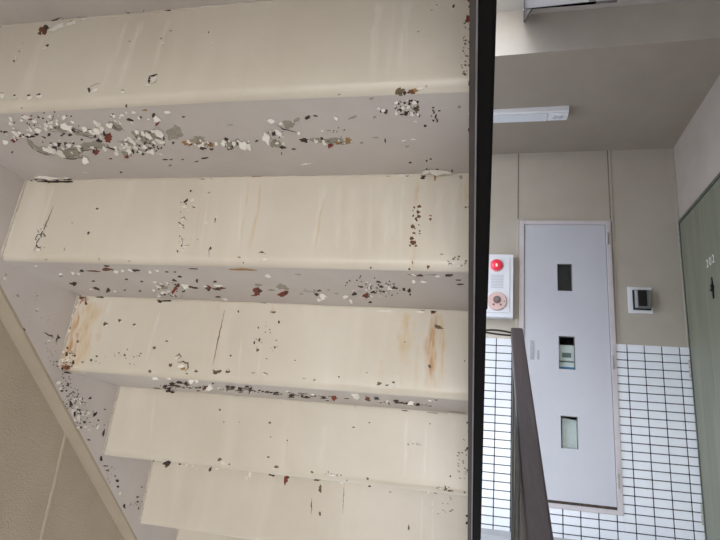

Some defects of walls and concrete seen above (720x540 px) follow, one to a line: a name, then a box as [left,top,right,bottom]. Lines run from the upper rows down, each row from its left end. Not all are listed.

peeling [0,104,363,173]
peeling [373,99,441,127]
crack [33,207,53,252]
peeling [71,258,228,303]
peeling [342,275,426,304]
rust [60,280,126,374]
crack [212,310,226,367]
rust [378,310,448,393]
peeling [56,372,106,441]
peeling [148,353,438,414]